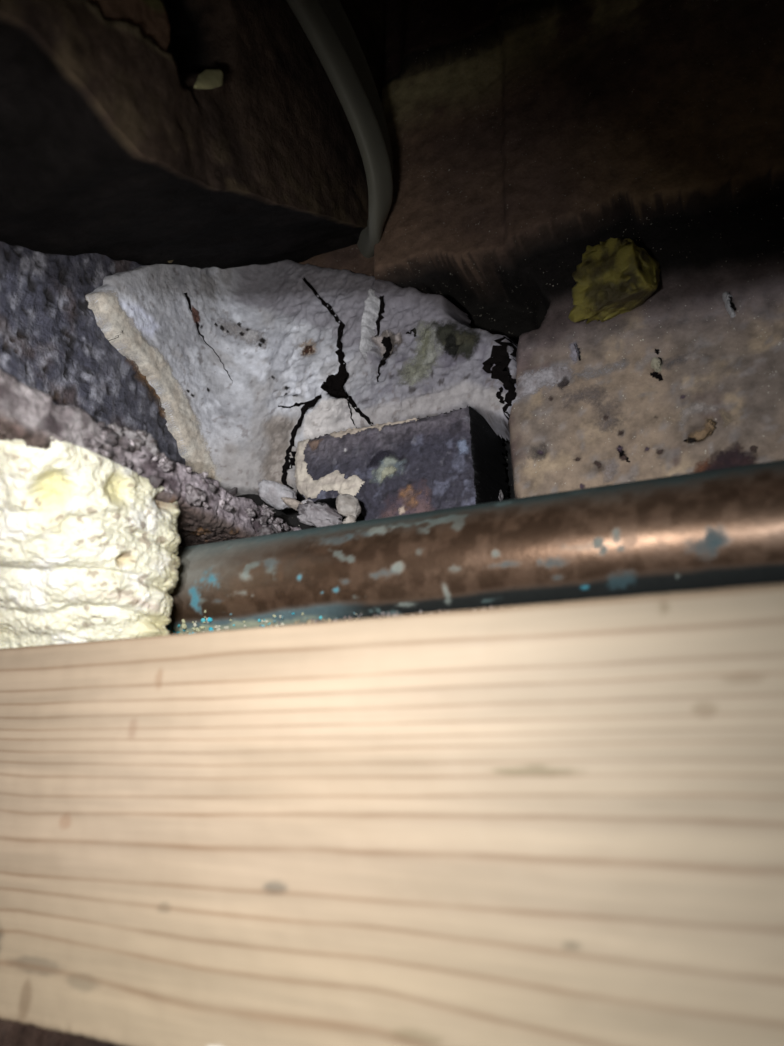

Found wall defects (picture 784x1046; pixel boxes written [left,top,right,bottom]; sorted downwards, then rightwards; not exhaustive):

crack [184,293,233,383]
crack [278,277,373,489]
crack [482,336,518,421]